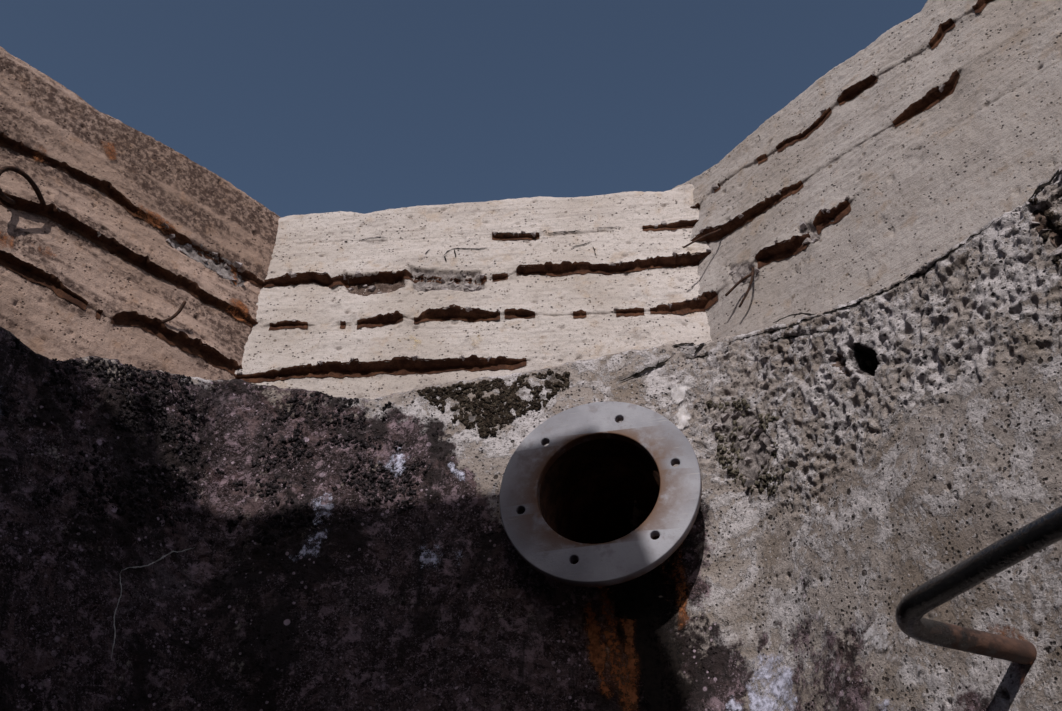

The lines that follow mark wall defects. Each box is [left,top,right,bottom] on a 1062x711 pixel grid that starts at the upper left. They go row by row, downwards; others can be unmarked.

spalling [161,223,246,288]
spalling [341,267,485,296]
spalling [799,220,820,245]
corrosion [583,586,640,711]